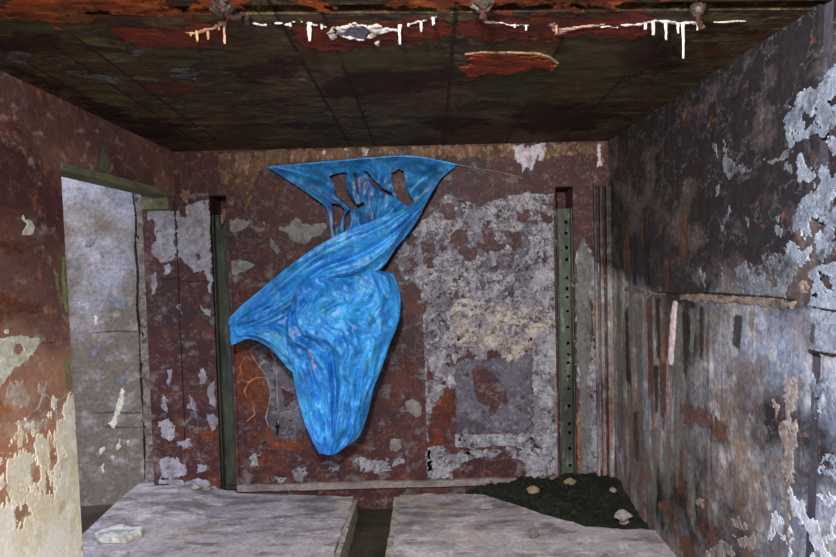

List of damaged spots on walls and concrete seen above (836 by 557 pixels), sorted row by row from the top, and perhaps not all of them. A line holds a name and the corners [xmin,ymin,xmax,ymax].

corrosion [0,0,231,49]
corrosion [287,0,660,51]
peeling [218,141,607,233]
peeling [668,64,836,366]
peeling [0,329,83,557]
peeling [133,189,218,488]
corrosion [232,345,272,413]
corrosion [427,387,455,452]
peeling [395,191,560,480]
water stain [575,240,606,474]
corrosion [646,260,669,417]
water stain [616,295,756,531]